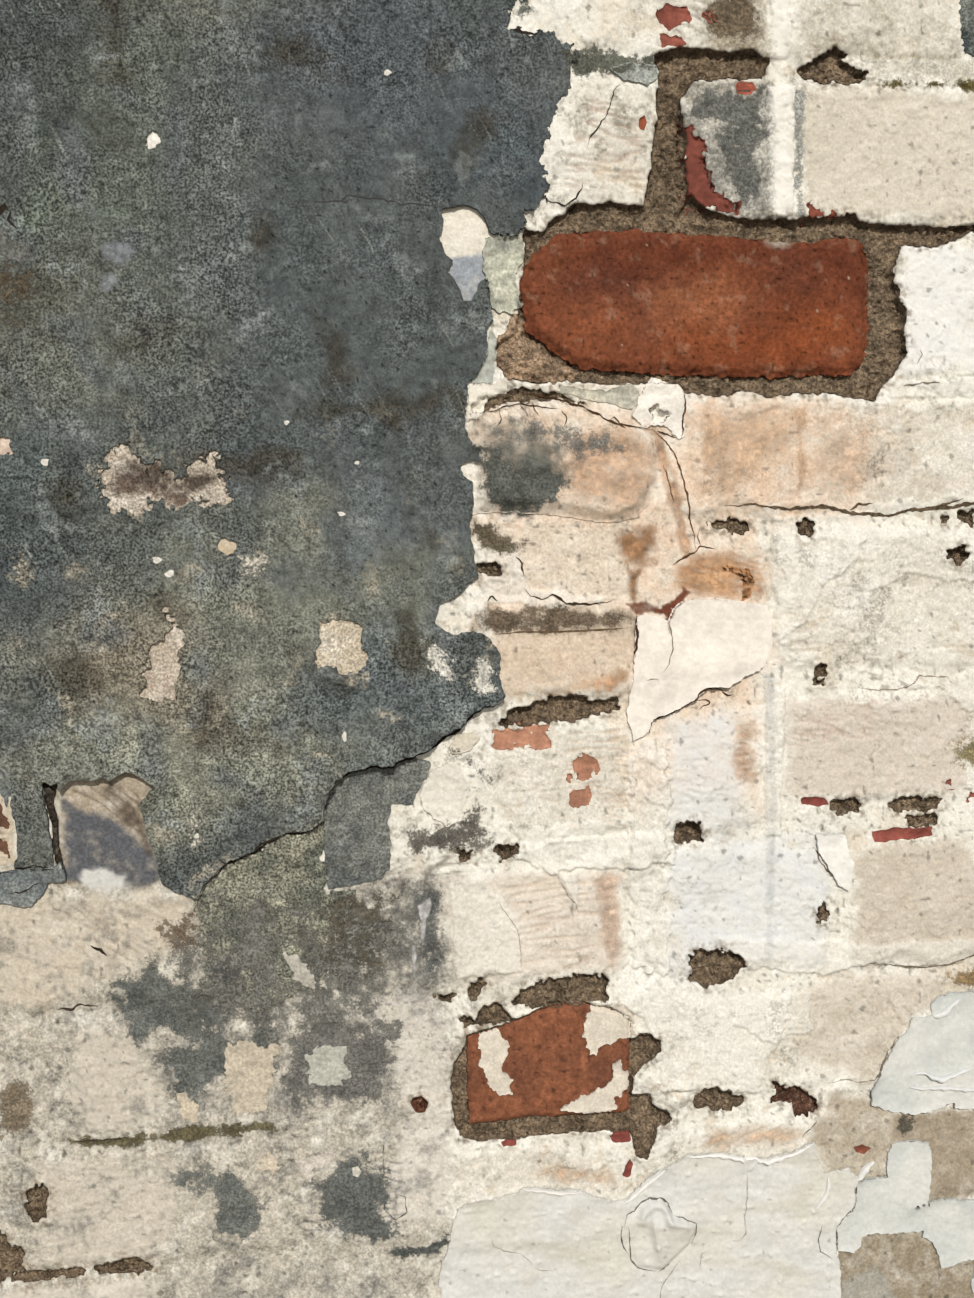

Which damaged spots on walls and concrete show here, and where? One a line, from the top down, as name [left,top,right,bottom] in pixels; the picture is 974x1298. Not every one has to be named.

flaking render [0,0,974,1014]
crack [481,391,974,565]
crack [201,702,502,890]
spalling [24,1183,49,1223]
spalling [0,1230,153,1283]
peeling [433,973,974,1298]